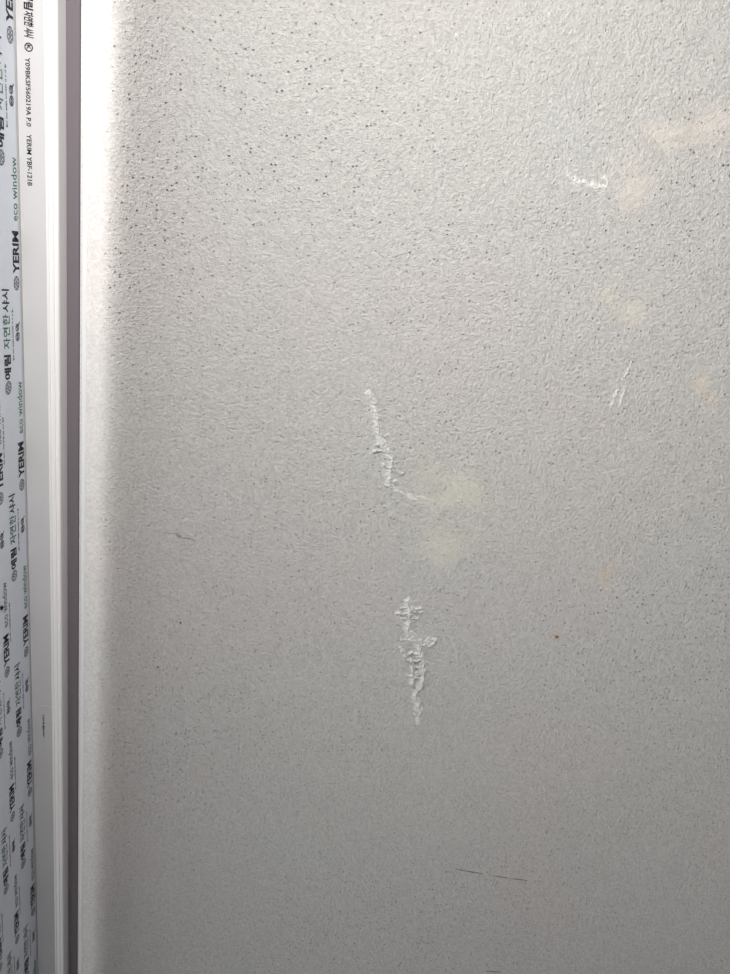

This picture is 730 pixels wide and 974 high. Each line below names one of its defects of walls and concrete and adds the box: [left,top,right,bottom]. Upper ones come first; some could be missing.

crack [365,389,433,504]
crack [394,595,437,726]